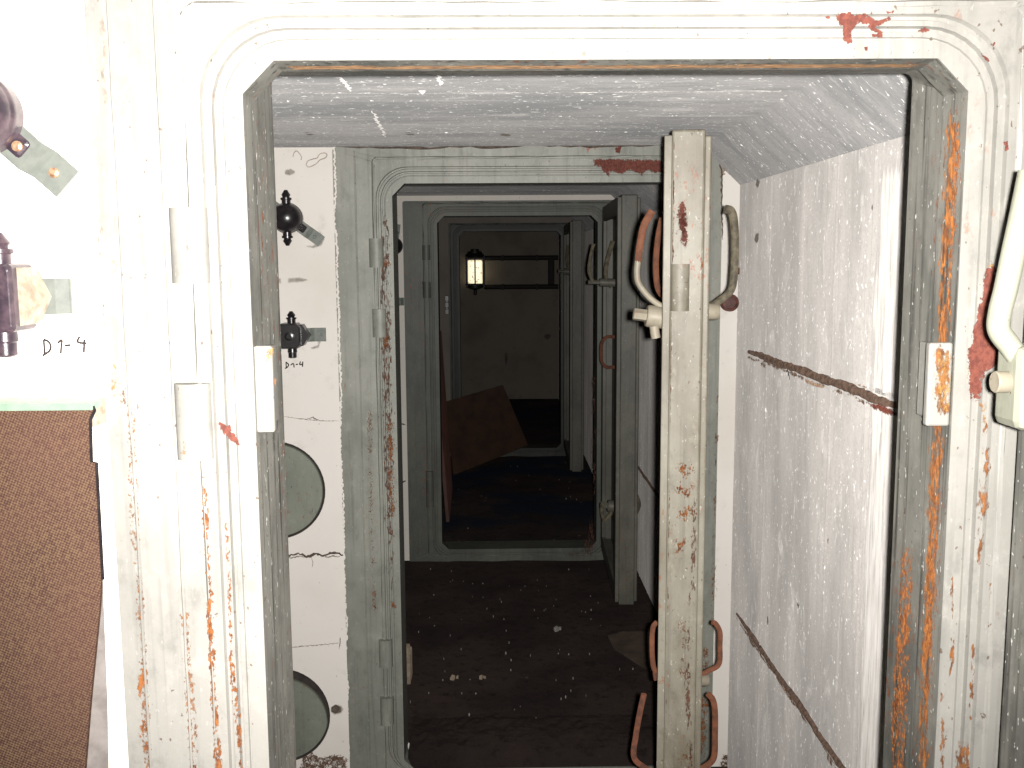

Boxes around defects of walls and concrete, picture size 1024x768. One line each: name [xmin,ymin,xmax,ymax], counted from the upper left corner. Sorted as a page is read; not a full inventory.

corrosion [593,147,688,261]
corrosion [112,382,139,550]
corrosion [136,577,152,768]
corrosion [202,487,222,768]
corrosion [227,574,242,766]
crack [289,551,343,567]
corrosion [366,216,396,609]
corrosion [891,110,969,768]
corrosion [968,264,999,432]
corrosion [977,448,991,516]